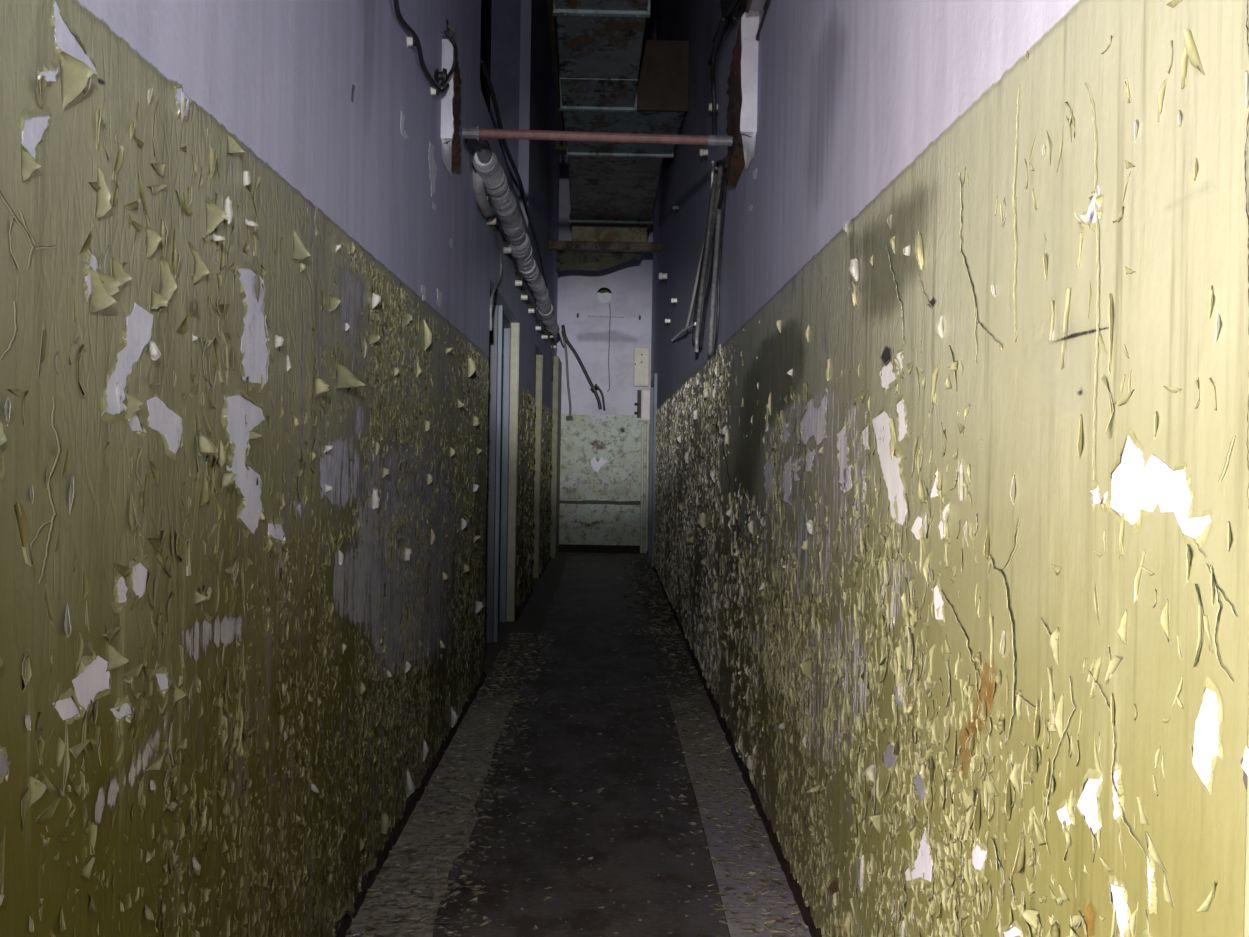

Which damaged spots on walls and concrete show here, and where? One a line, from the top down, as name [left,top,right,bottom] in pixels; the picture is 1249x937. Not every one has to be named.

peeling [19,0,97,182]
peeling [173,81,191,122]
peeling [1157,29,1205,122]
peeling [995,101,1076,227]
peeling [846,255,873,313]
peeling [887,214,924,272]
peeling [1075,160,1135,268]
leakage [881,347,891,366]
peeling [0,389,29,481]
peeling [13,88,489,937]
peeling [654,280,1224,937]
peeling [0,745,11,784]